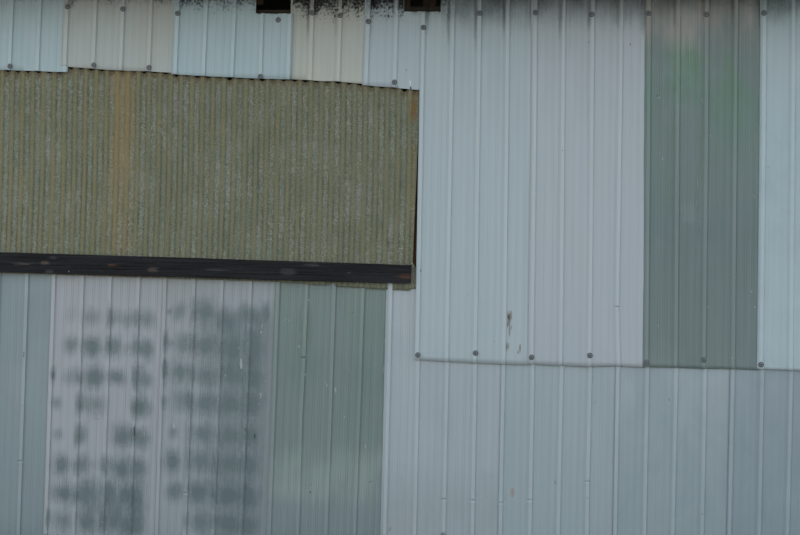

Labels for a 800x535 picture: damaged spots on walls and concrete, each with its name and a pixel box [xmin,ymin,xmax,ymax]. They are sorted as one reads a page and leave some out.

leakage [293,0,404,21]
leakage [86,368,145,386]
leakage [57,457,144,535]